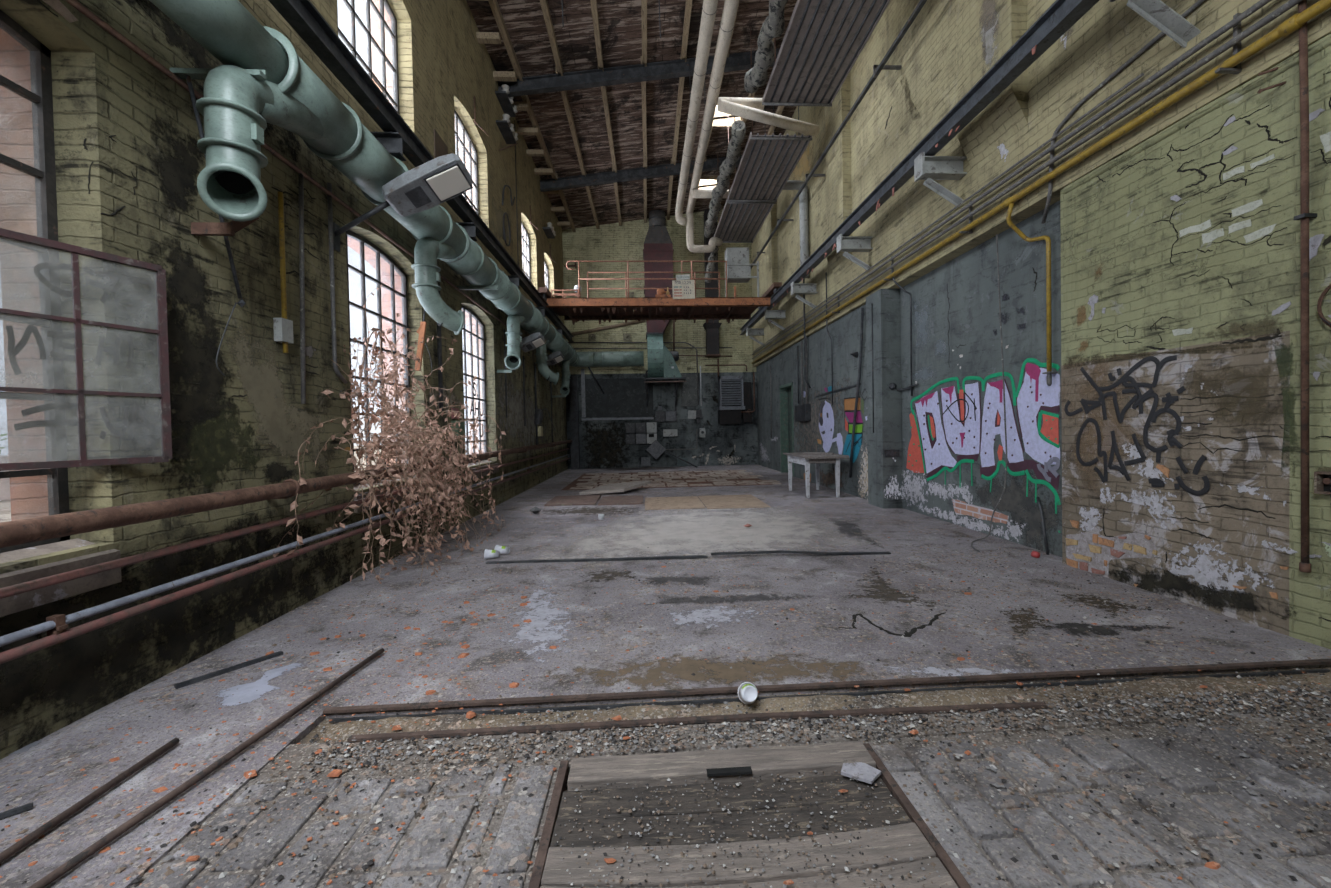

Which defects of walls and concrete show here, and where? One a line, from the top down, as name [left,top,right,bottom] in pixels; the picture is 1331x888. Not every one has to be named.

flaking render [1320,131,1331,153]
flaking render [1222,146,1275,180]
crack [1097,105,1331,344]
flaking render [1179,199,1277,244]
crack [1097,316,1175,350]
leakage [125,238,239,495]
flaking render [952,499,1009,524]
leakage [1221,485,1286,506]
flaking render [1065,520,1158,575]
leakage [1261,540,1297,554]
leakage [1160,540,1275,593]
crack [838,612,946,637]